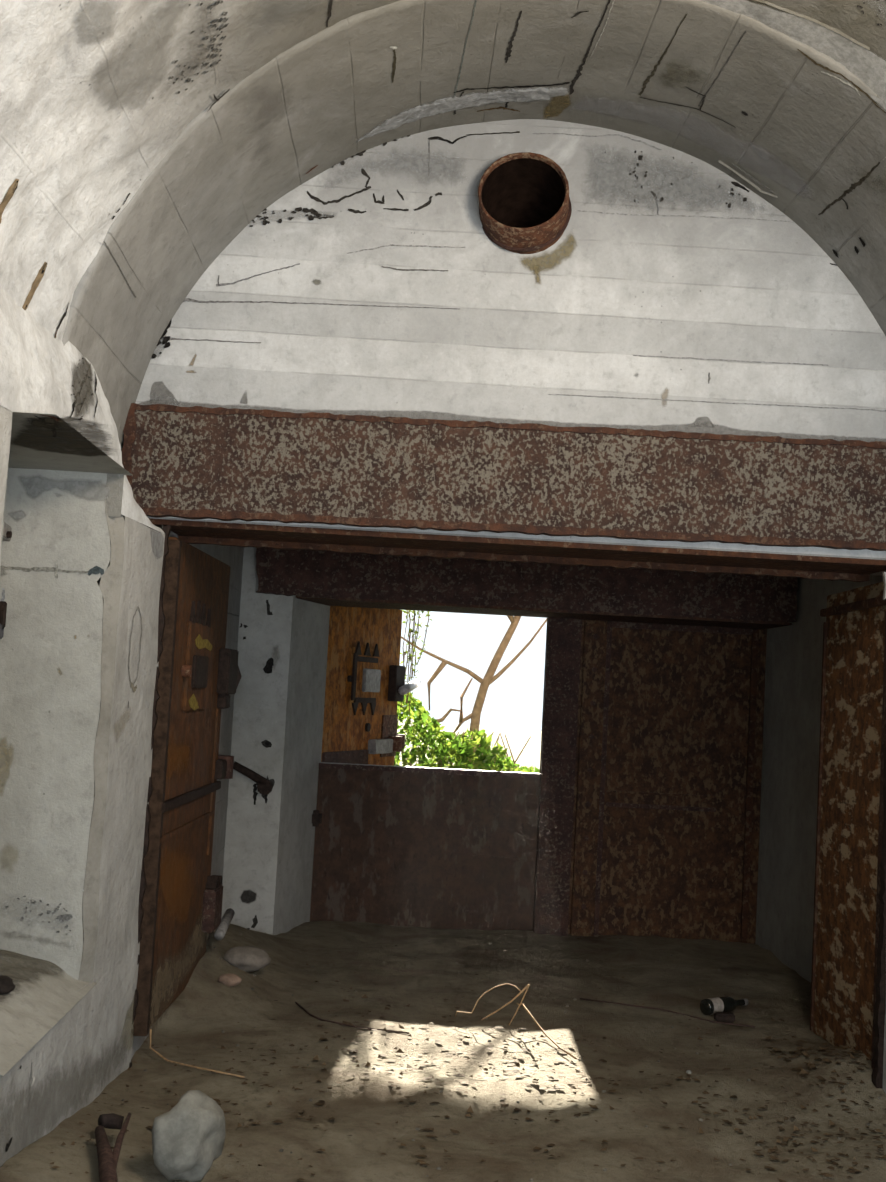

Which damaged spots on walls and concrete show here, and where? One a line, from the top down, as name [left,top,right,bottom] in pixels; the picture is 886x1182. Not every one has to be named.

spalling [332,87,568,168]
crack [306,0,661,219]
crack [639,14,746,128]
crack [347,244,466,272]
corrosion [522,235,575,283]
spalling [71,358,94,419]